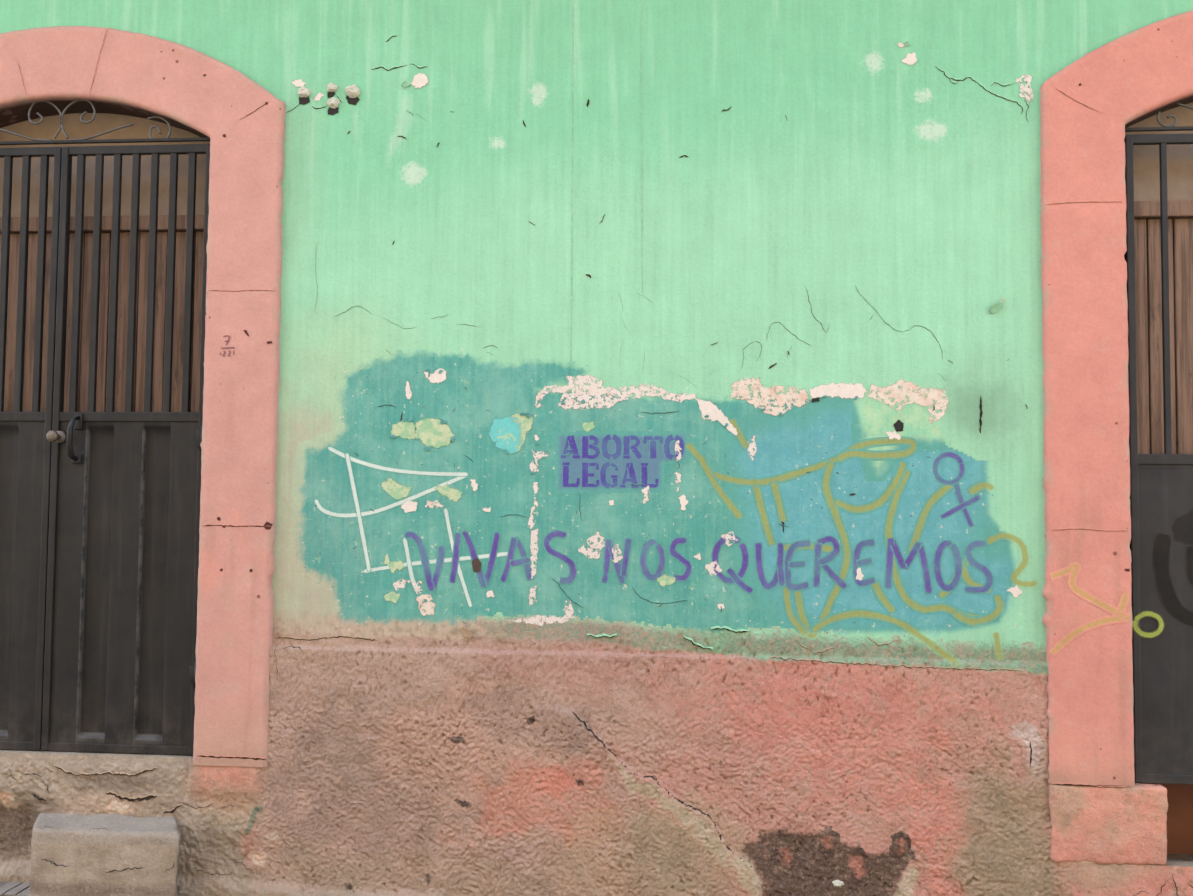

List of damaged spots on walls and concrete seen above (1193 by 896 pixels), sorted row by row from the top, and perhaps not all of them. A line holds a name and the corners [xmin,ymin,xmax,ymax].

crack [936,66,1030,122]
crack [314,241,498,355]
crack [740,286,829,369]
crack [856,285,946,380]
peeling [424,368,448,383]
peeling [389,417,455,451]
peeling [381,478,478,513]
spalling [458,375,1047,678]
peeling [383,554,436,616]
crack [9,764,234,829]